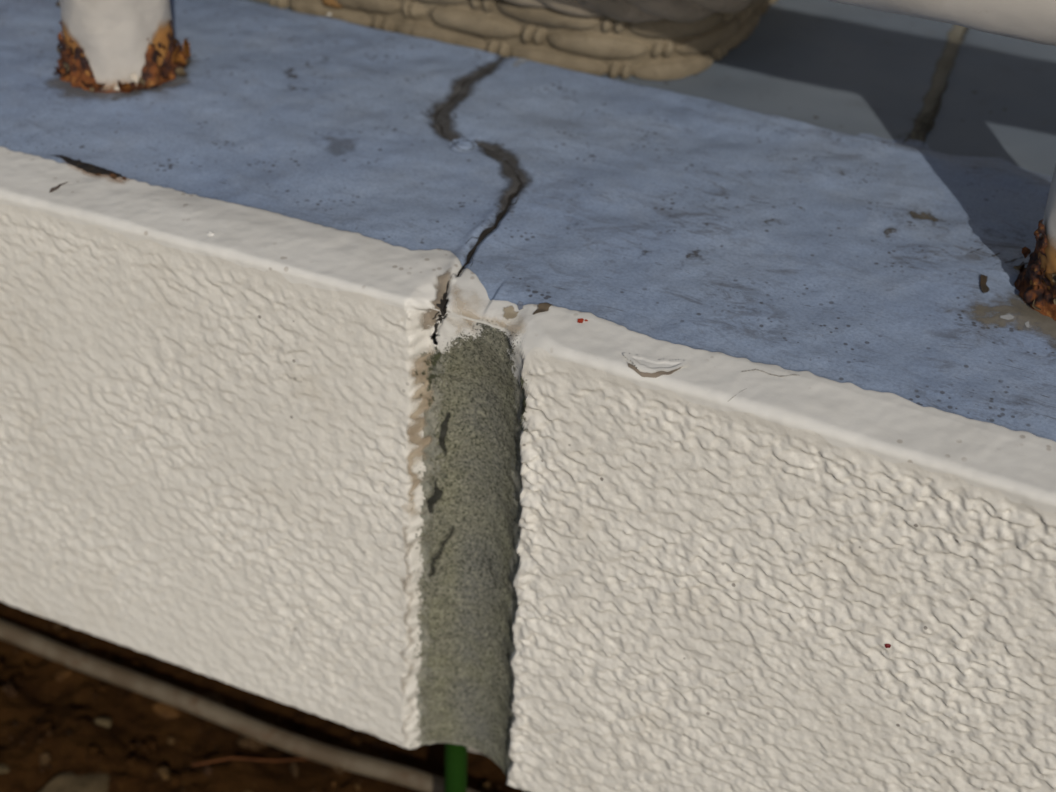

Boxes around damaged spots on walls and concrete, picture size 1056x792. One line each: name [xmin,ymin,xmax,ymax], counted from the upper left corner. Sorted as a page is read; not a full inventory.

corrosion [53,20,191,93]
spalling [54,155,126,182]
crack [431,57,522,338]
corrosion [1013,219,1056,321]
peeling [623,352,687,378]